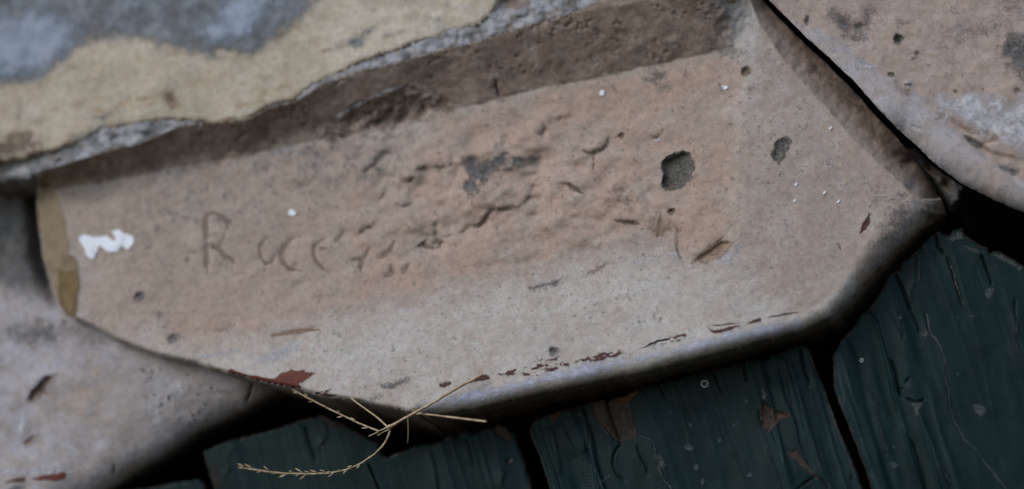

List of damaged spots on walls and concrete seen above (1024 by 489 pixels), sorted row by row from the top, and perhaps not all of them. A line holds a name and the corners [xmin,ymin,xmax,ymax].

spalling [660,150,695,191]
peeling [590,390,672,489]